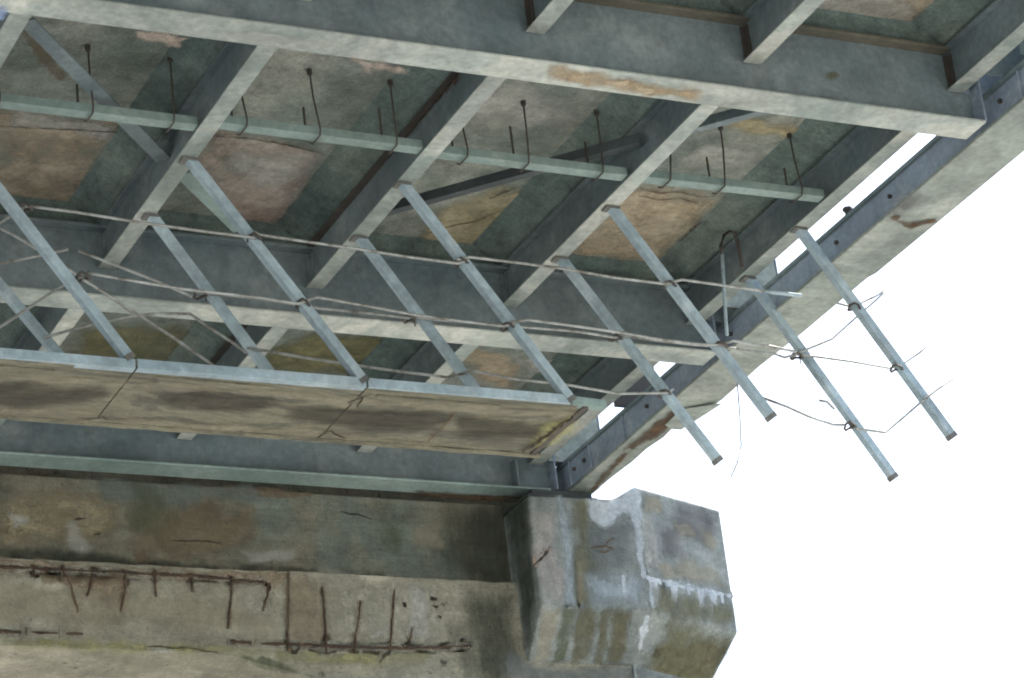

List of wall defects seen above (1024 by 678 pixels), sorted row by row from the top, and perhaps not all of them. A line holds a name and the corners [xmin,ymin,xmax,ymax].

rust [891,215,936,229]
leakage [0,379,103,408]
leakage [169,393,274,411]
rust [591,412,675,493]
spalling [0,559,469,667]
leakage [507,488,733,678]